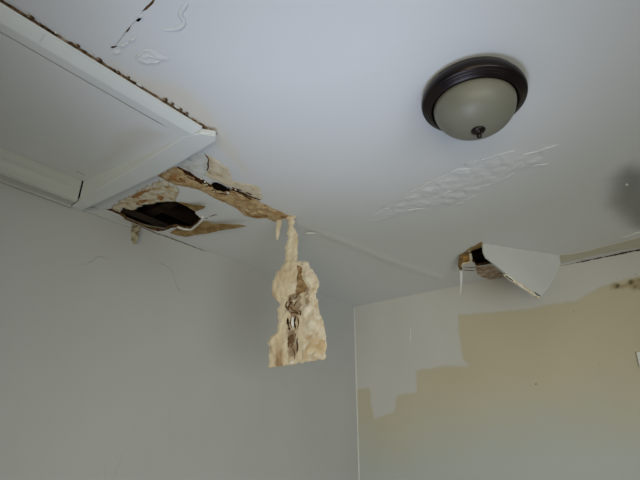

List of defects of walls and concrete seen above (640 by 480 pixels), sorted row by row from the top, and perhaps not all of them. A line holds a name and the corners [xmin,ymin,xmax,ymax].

crack [111,0,155,55]
flaking render [178,151,208,176]
spalling [103,208,201,244]
peeling [355,232,640,423]